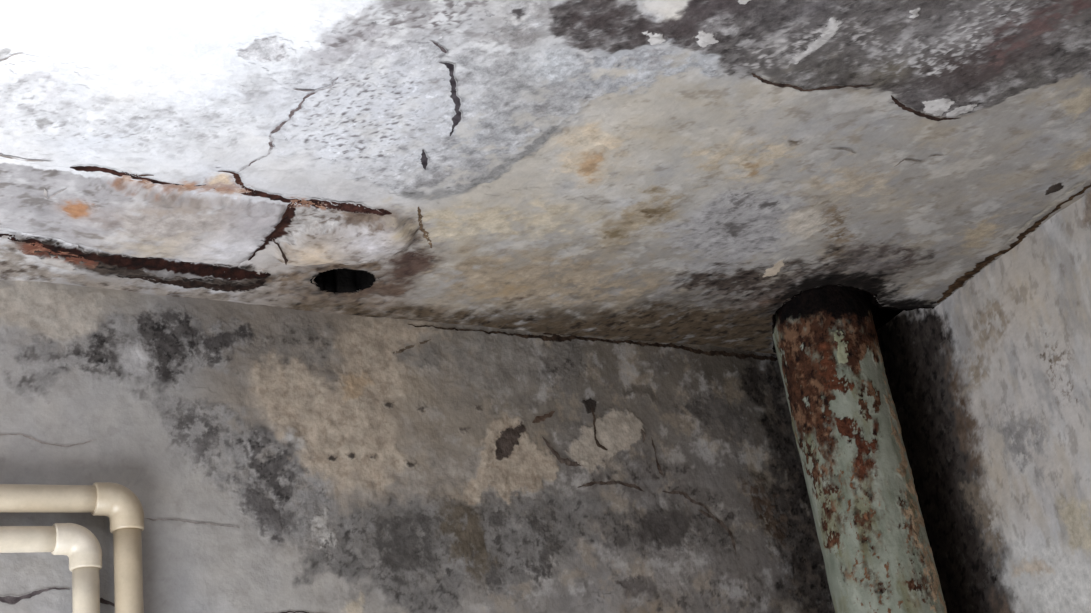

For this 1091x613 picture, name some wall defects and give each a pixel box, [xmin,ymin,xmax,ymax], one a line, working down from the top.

corrosion [22,238,103,270]
crack [0,78,392,293]
corrosion [96,165,331,213]
crack [429,40,463,137]
peeling [0,0,1091,252]
crack [936,175,1091,303]
water stain [1048,82,1091,232]
peeling [229,314,471,512]
water stain [0,113,835,613]
peeling [445,395,664,508]
water stain [590,124,1091,613]
corrosion [774,286,947,613]